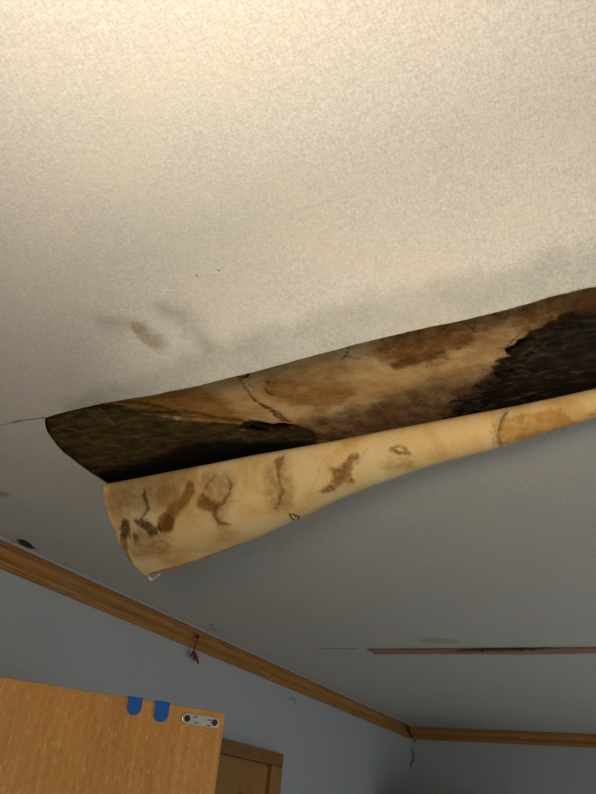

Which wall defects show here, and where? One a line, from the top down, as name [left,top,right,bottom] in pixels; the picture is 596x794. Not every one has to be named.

damp [45,310,596,483]
damp [310,451,366,497]